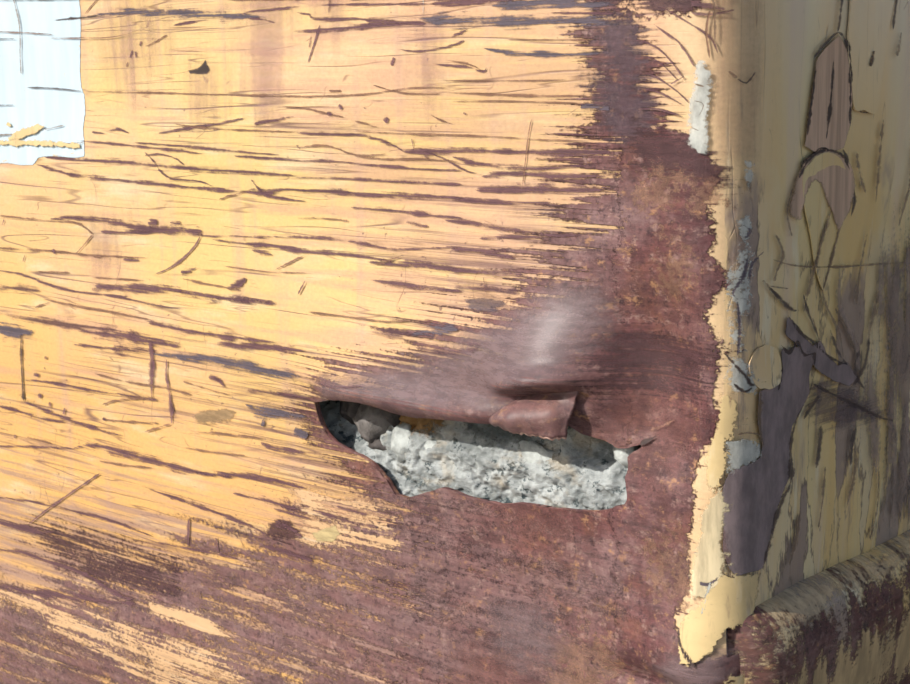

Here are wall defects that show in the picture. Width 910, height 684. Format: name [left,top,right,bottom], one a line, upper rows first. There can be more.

rust [585,0,651,24]
rust [637,0,702,18]
peeling [0,122,82,149]
peeling [687,60,713,154]
peeling [789,0,898,291]
rust [0,20,733,684]
spalling [319,400,642,510]
peeling [678,216,893,667]
rust [709,540,910,684]